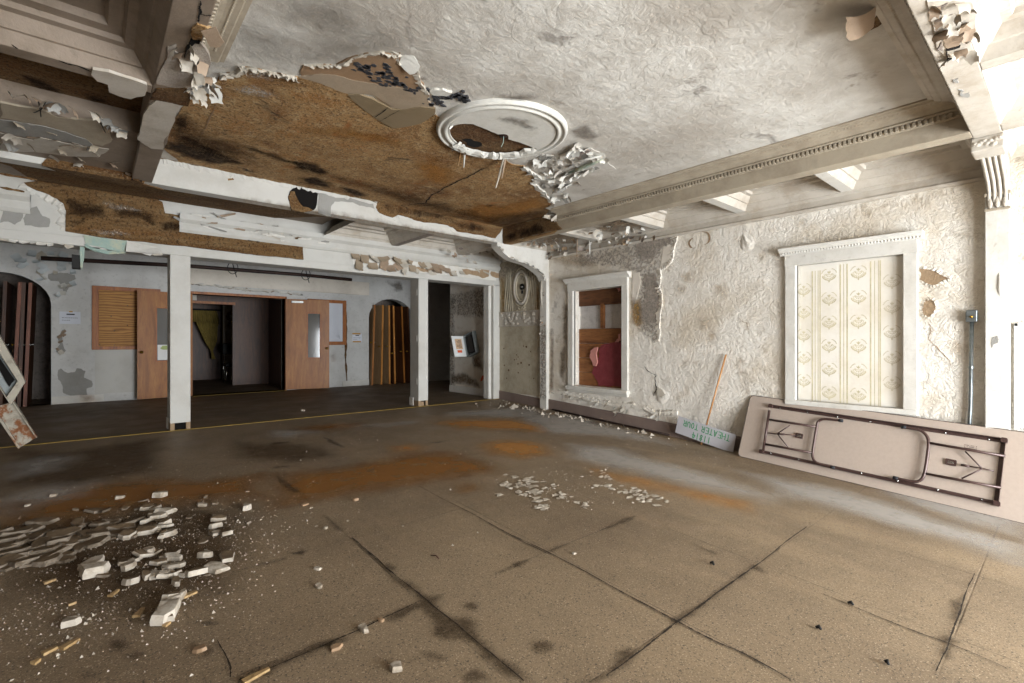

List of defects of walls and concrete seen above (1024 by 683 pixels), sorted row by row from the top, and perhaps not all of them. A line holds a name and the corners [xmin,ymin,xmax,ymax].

peeling [846,7,882,41]
peeling [927,0,980,69]
flaking render [0,23,678,421]
crack [401,168,485,208]
flaking render [918,266,953,320]
crack [824,573,1006,671]